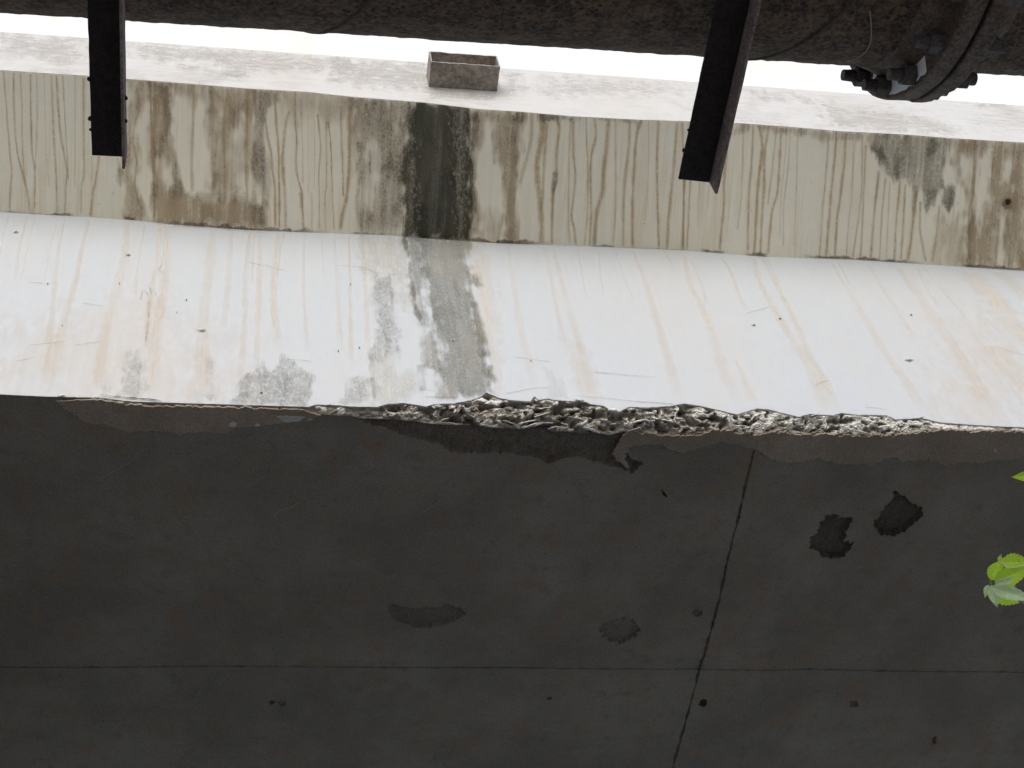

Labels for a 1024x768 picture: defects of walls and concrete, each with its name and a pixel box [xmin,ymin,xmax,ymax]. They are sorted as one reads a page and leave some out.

water stain [130,83,297,226]
water stain [492,114,525,239]
water stain [536,114,560,240]
spalling [56,359,1024,474]
spalling [809,513,854,559]
spalling [873,490,924,537]
crack [673,451,755,765]